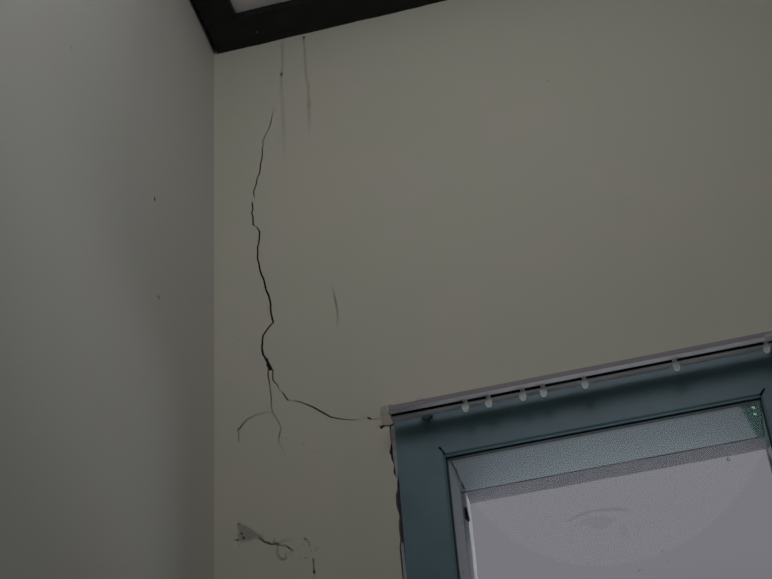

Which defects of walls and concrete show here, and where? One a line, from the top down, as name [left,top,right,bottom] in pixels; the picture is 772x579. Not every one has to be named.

crack [251,119,347,420]